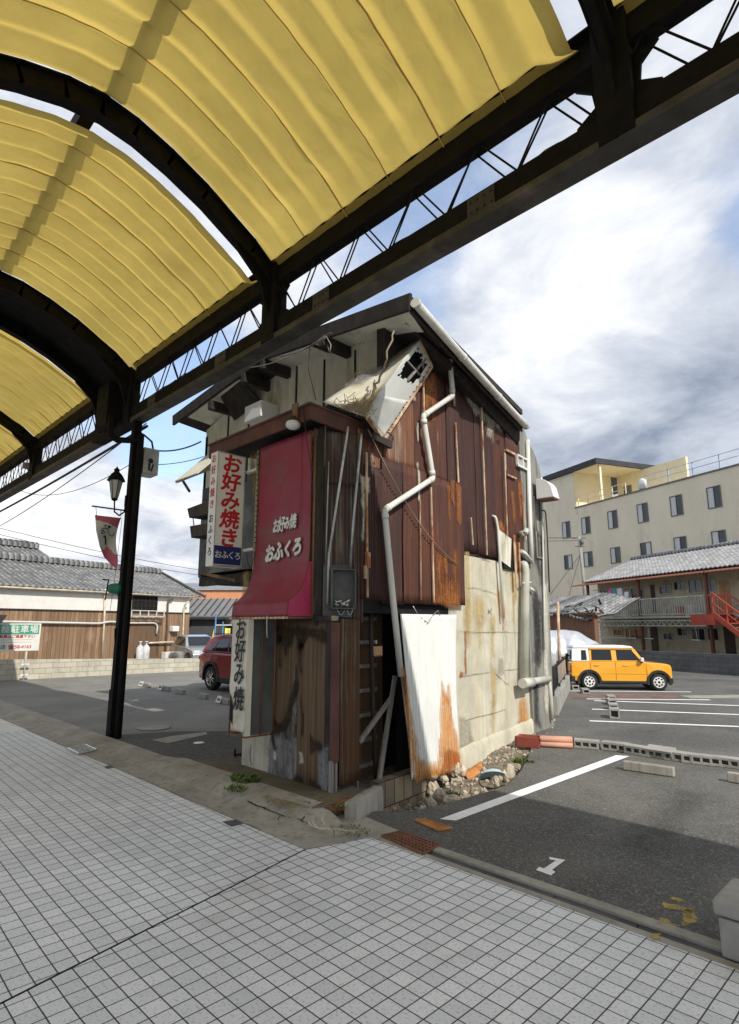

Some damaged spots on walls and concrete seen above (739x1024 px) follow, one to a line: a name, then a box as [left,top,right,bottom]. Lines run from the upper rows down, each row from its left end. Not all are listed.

rust [448,482,461,523]
rust [436,553,459,606]
water stain [533,582,549,726]
water stain [268,626,329,791]
rust [405,685,462,780]